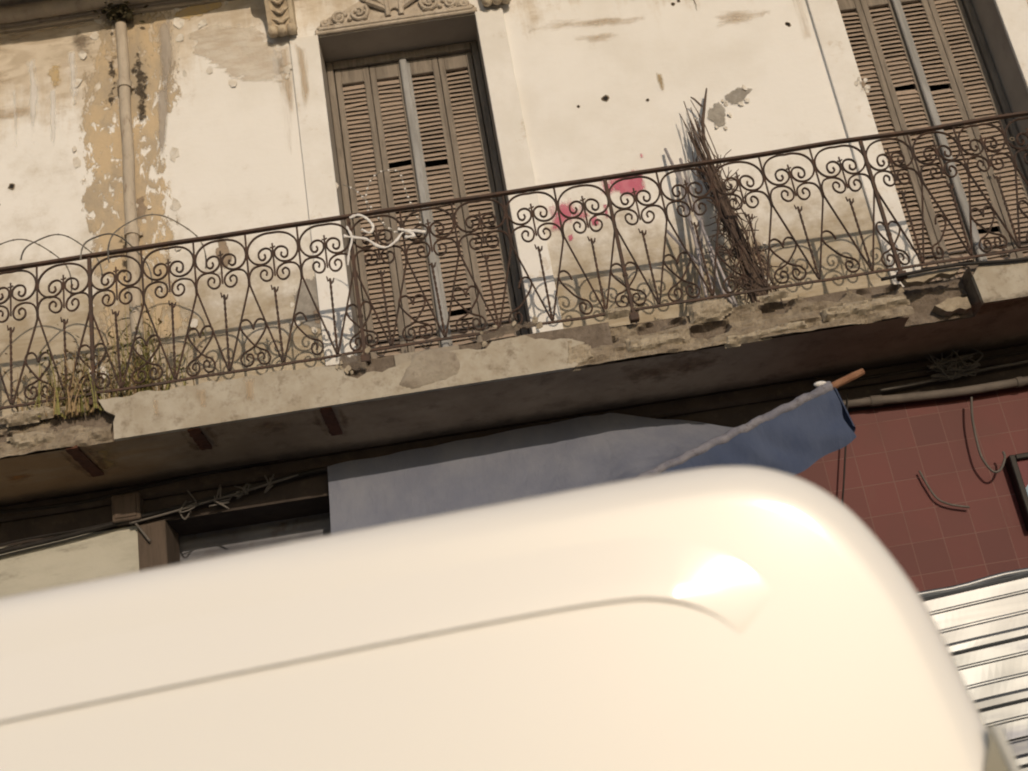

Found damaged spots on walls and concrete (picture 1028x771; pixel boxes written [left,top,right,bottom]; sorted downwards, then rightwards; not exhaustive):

peeling [72,1,292,379]
spalling [335,346,371,374]
spalling [480,316,543,348]
spalling [567,240,974,371]
spalling [0,405,113,477]